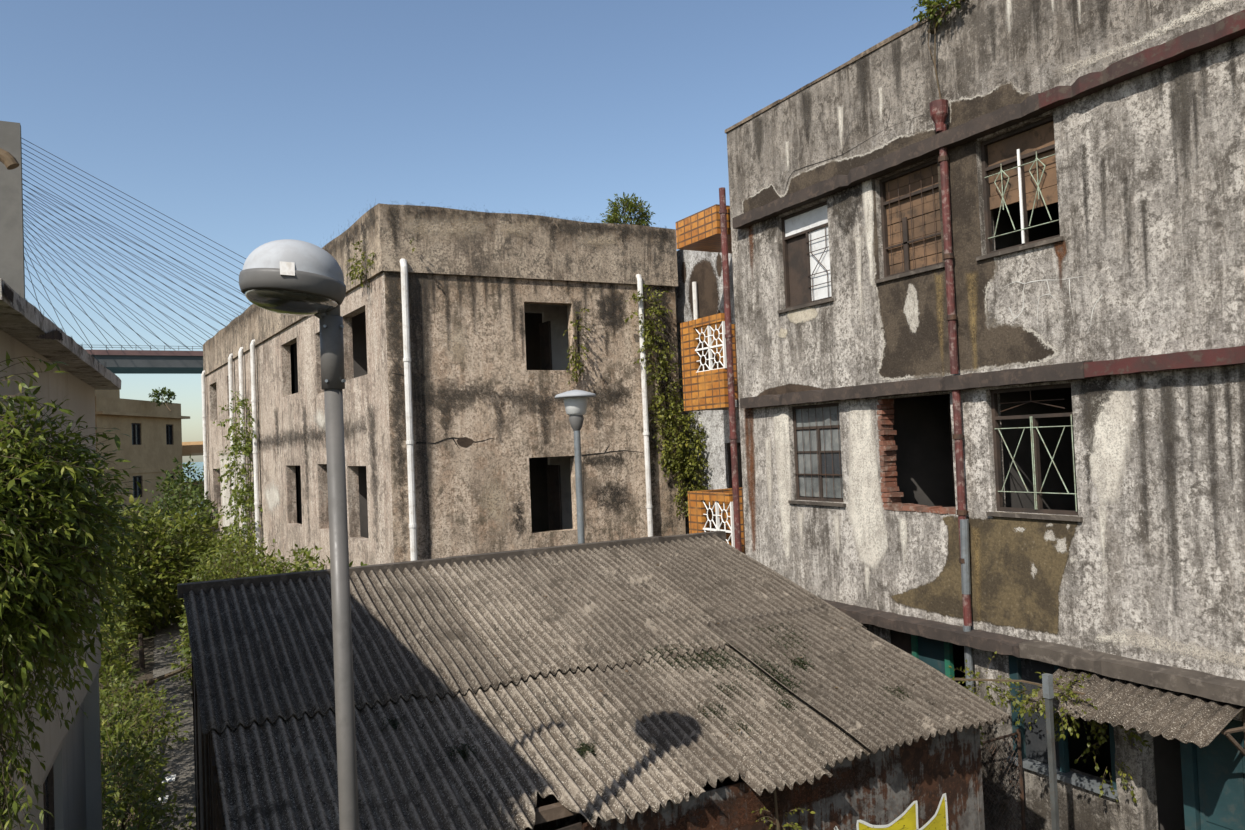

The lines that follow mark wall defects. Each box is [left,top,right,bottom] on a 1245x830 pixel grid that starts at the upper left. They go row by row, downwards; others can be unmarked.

peeling [742,81,1031,214]
leakage [567,281,626,362]
peeling [778,307,818,338]
peeling [870,138,1061,382]
corrosion [968,274,976,356]
leakage [220,408,326,535]
leakage [386,271,564,562]
leakage [648,286,675,535]
leakage [1079,375,1146,556]
leakage [1161,371,1193,607]
peeling [891,512,1079,635]
corrosion [660,761,876,830]